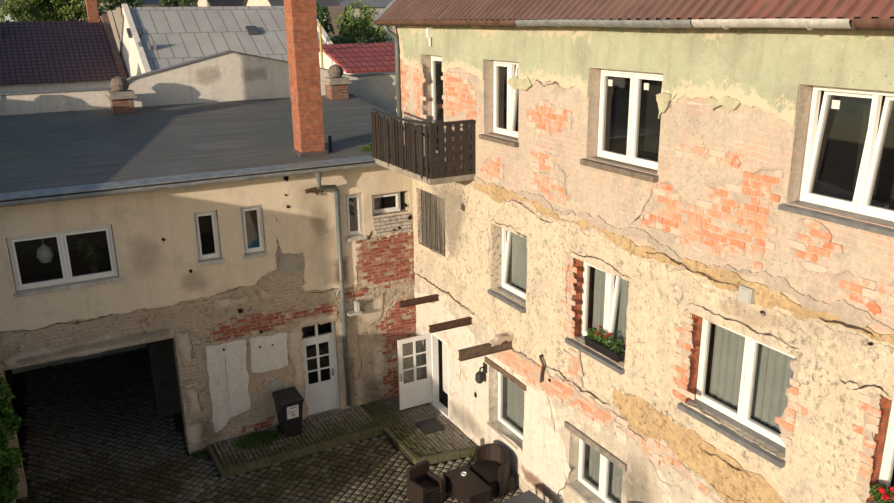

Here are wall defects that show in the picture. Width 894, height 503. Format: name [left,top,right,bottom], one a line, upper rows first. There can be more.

flaking render [395,60,427,120]
flaking render [441,71,477,121]
flaking render [526,100,574,136]
peeling [656,92,672,119]
peeling [706,96,741,110]
flaking render [636,143,785,271]
flaking render [207,203,416,400]
flaking render [787,217,894,316]
flaking render [493,251,747,503]
flaking render [775,359,808,449]
flaking render [844,393,882,503]
crack [841,381,890,398]